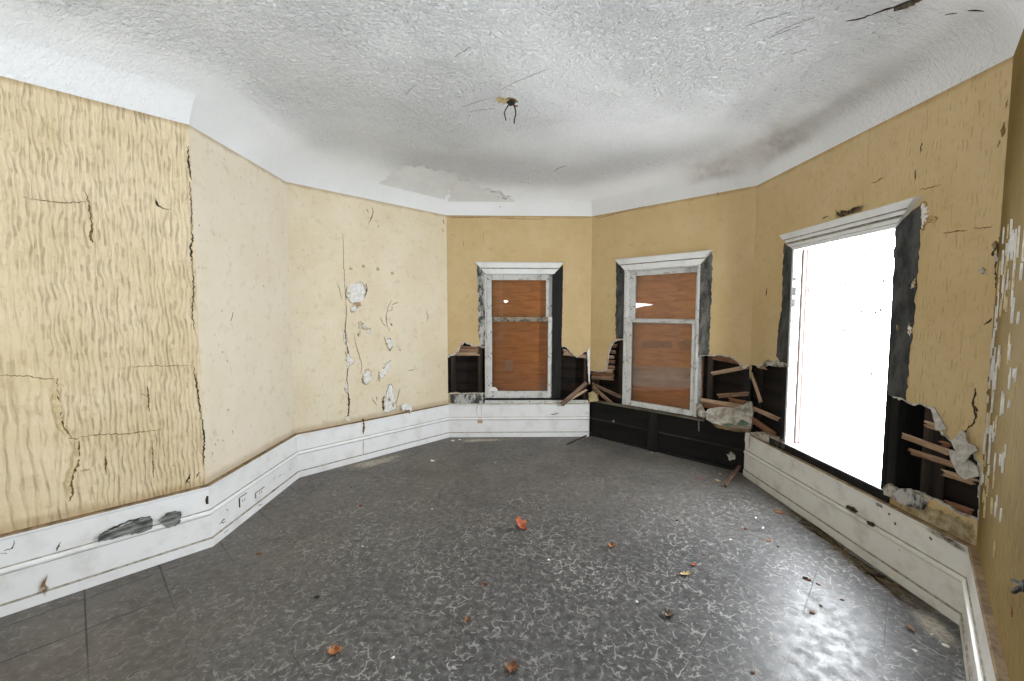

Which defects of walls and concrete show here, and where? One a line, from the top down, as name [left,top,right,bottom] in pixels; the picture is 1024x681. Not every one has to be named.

crack [848,0,922,21]
peeling [343,282,371,394]
peeling [362,338,412,414]
flaking render [562,262,625,414]
flaking render [698,243,797,448]
flaking render [876,201,1024,522]
spalling [97,511,182,542]